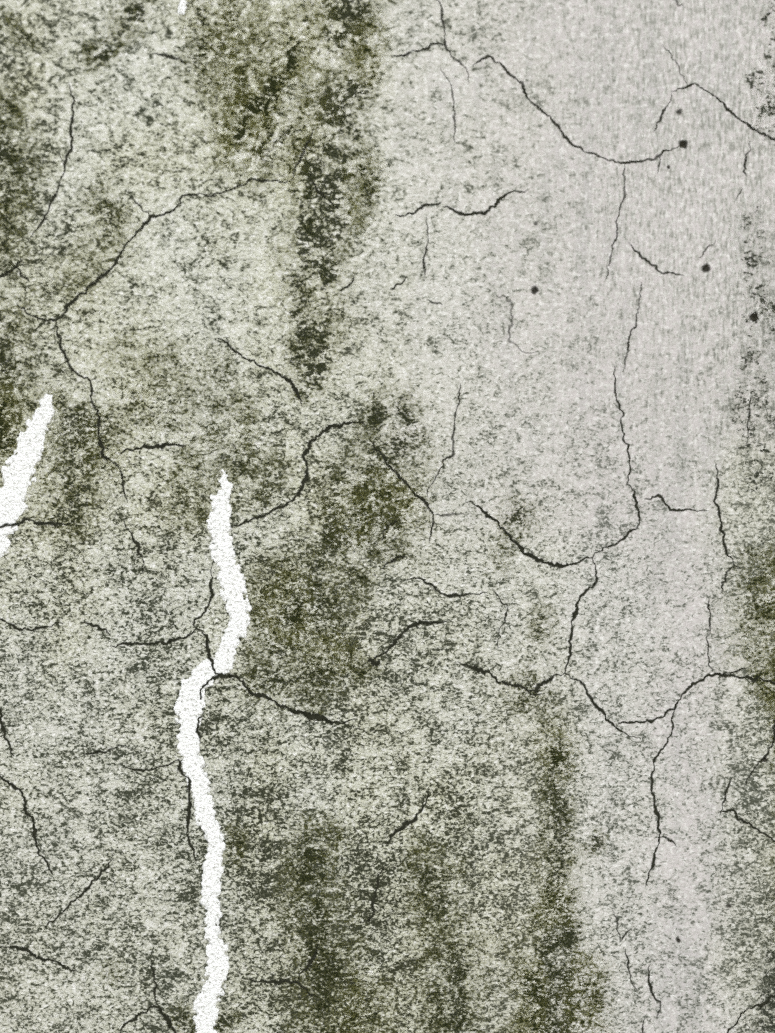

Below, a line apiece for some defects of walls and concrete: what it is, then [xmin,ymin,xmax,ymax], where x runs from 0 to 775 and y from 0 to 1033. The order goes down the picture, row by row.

crack [0,85,75,281]
damp [183,0,383,402]
damp [0,285,154,541]
crack [16,127,337,573]
crack [0,567,353,739]
damp [244,386,438,714]
crack [218,0,775,885]
crack [0,709,53,874]
crack [84,745,196,862]
damp [276,815,395,1033]
damp [404,839,490,1033]
damp [502,663,610,1033]